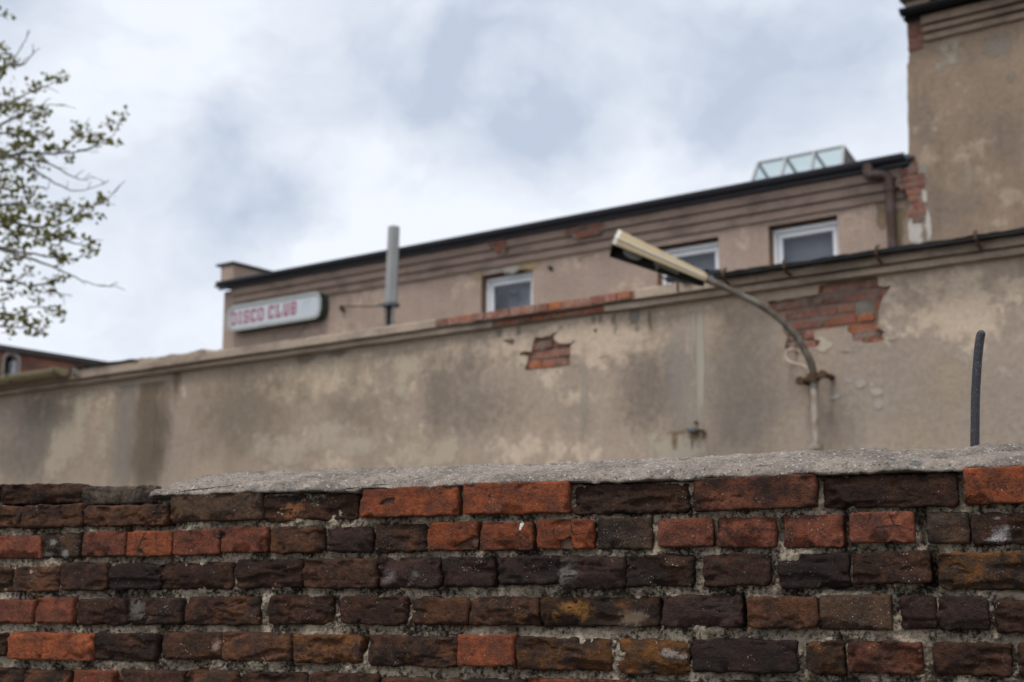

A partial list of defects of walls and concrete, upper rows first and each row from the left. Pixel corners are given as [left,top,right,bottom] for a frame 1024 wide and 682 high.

spalling [908,20,925,51]
spalling [875,160,932,246]
spalling [767,277,890,350]
spalling [504,332,575,370]